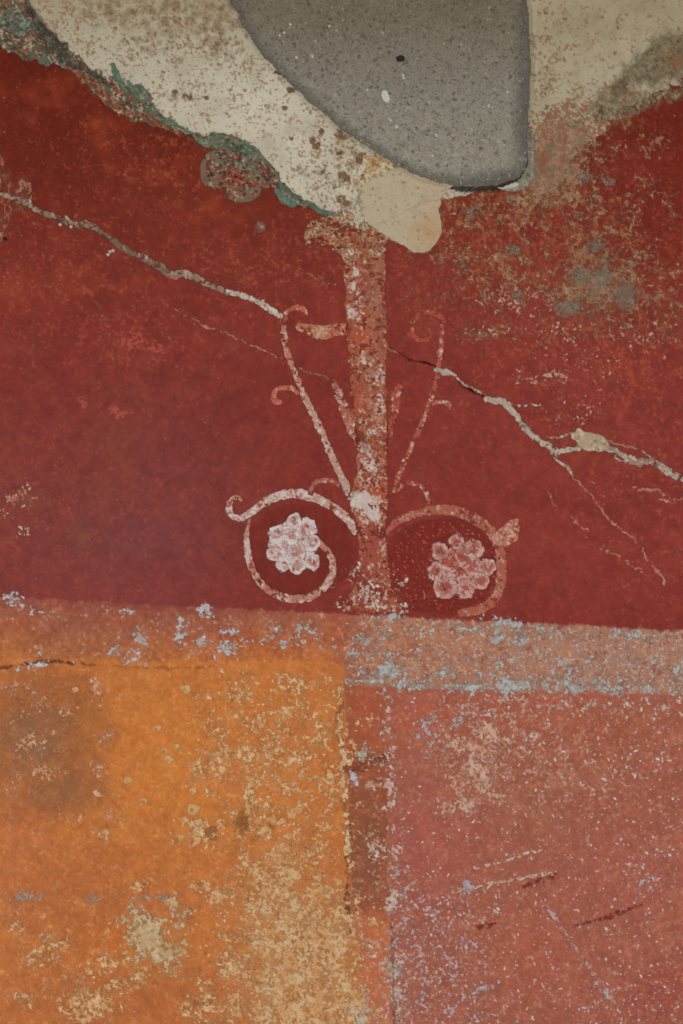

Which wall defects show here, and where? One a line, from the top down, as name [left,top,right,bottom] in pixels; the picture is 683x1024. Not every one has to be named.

crack [0,183,283,318]
flaking render [0,0,407,231]
crack [174,308,338,384]
crack [380,341,683,586]
flaking render [406,0,683,345]
peeling [1,650,416,1024]